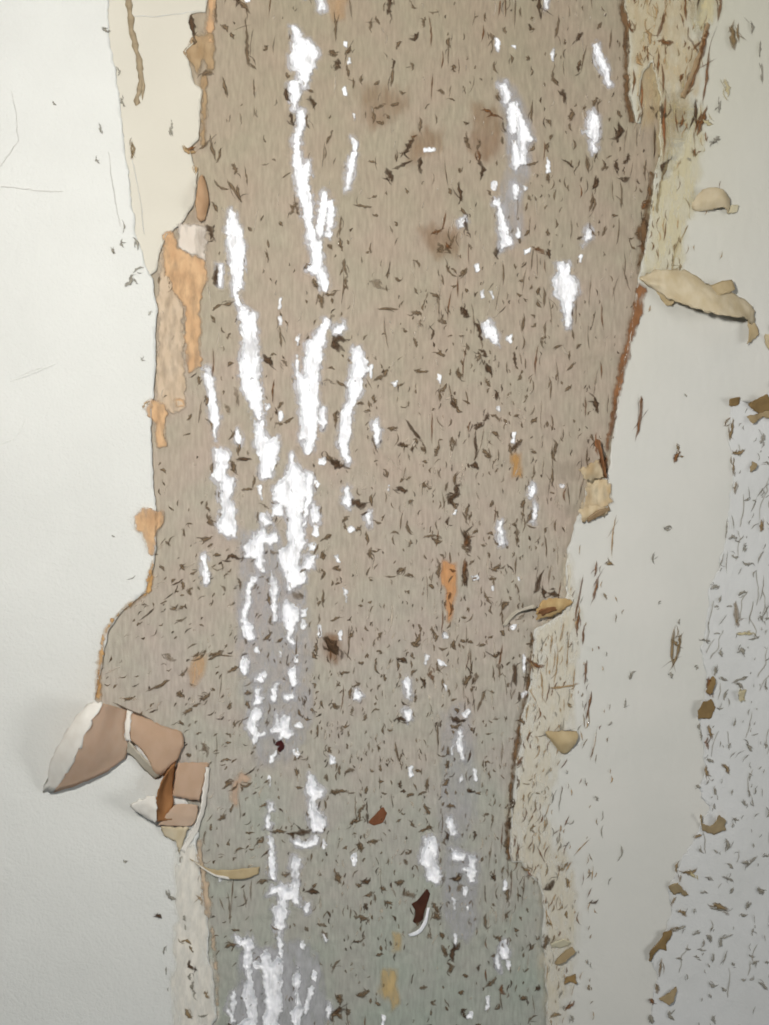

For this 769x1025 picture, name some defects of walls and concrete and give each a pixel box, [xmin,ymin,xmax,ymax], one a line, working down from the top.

spalling [288,25,336,292]
spalling [491,79,533,254]
spalling [552,225,594,329]
peeling [628,0,769,349]
spalling [200,207,346,785]
spalling [336,345,373,467]
peeling [725,394,769,424]
spalling [224,771,327,1025]
leakage [236,942,325,1025]
spalling [408,814,478,937]
leakage [511,612,575,936]
peeling [503,561,623,1025]